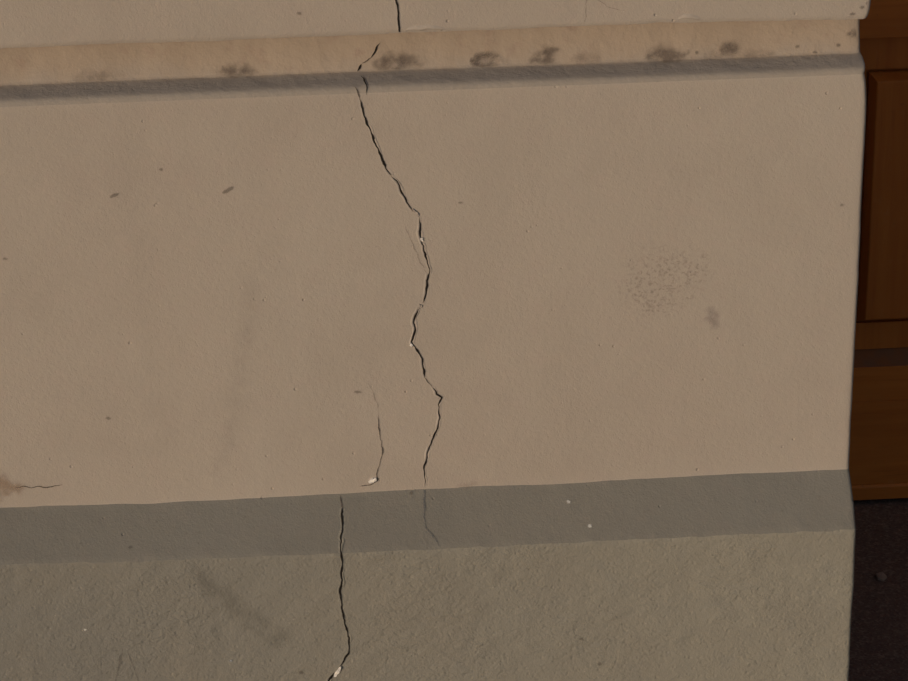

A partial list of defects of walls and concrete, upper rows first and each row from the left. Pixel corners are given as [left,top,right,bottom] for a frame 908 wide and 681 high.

crack [355,0,444,545]
crack [326,496,353,681]